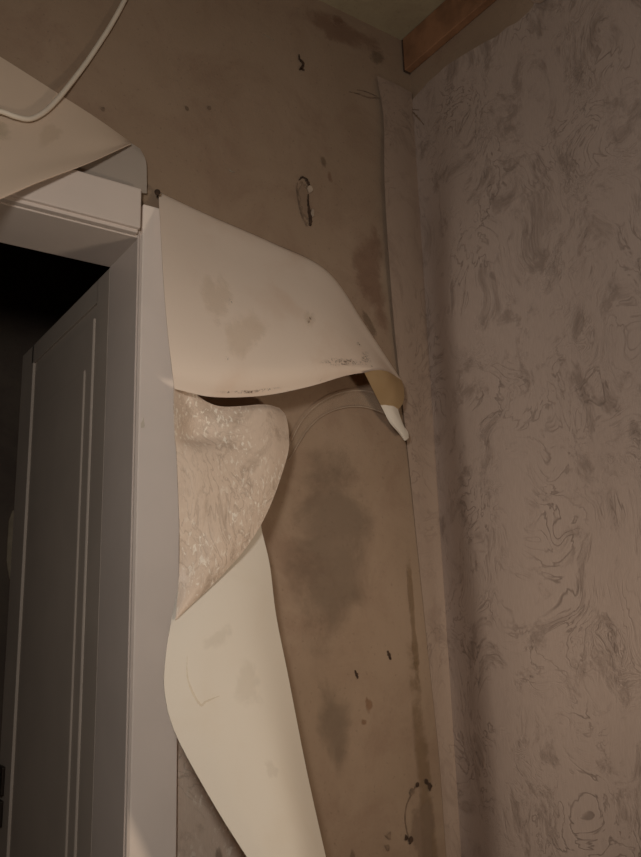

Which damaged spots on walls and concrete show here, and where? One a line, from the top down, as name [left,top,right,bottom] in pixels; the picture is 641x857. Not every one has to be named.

flaking render [296,176,314,226]